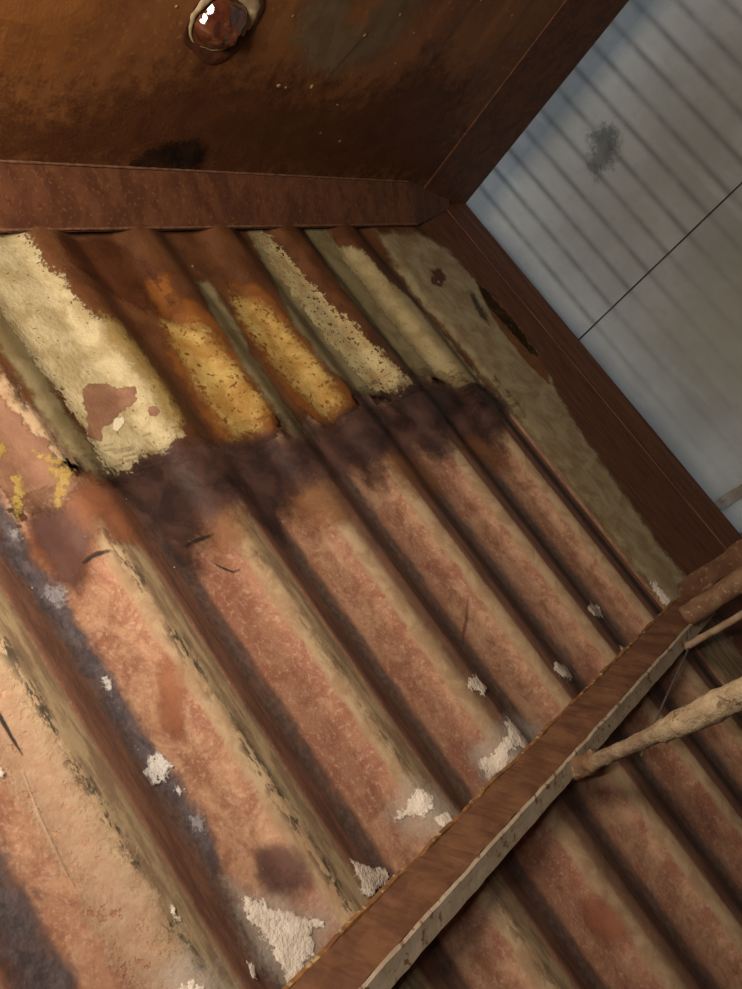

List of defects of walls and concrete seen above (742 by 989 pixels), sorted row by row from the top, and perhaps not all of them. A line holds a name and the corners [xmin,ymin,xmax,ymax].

corrosion [183,0,265,65]
leakage [587,126,618,173]
peeling [0,233,186,520]
corrosion [0,222,513,586]
leakage [102,381,508,570]
peeling [162,228,686,600]
peeling [0,679,189,989]
corrosion [282,590,685,989]